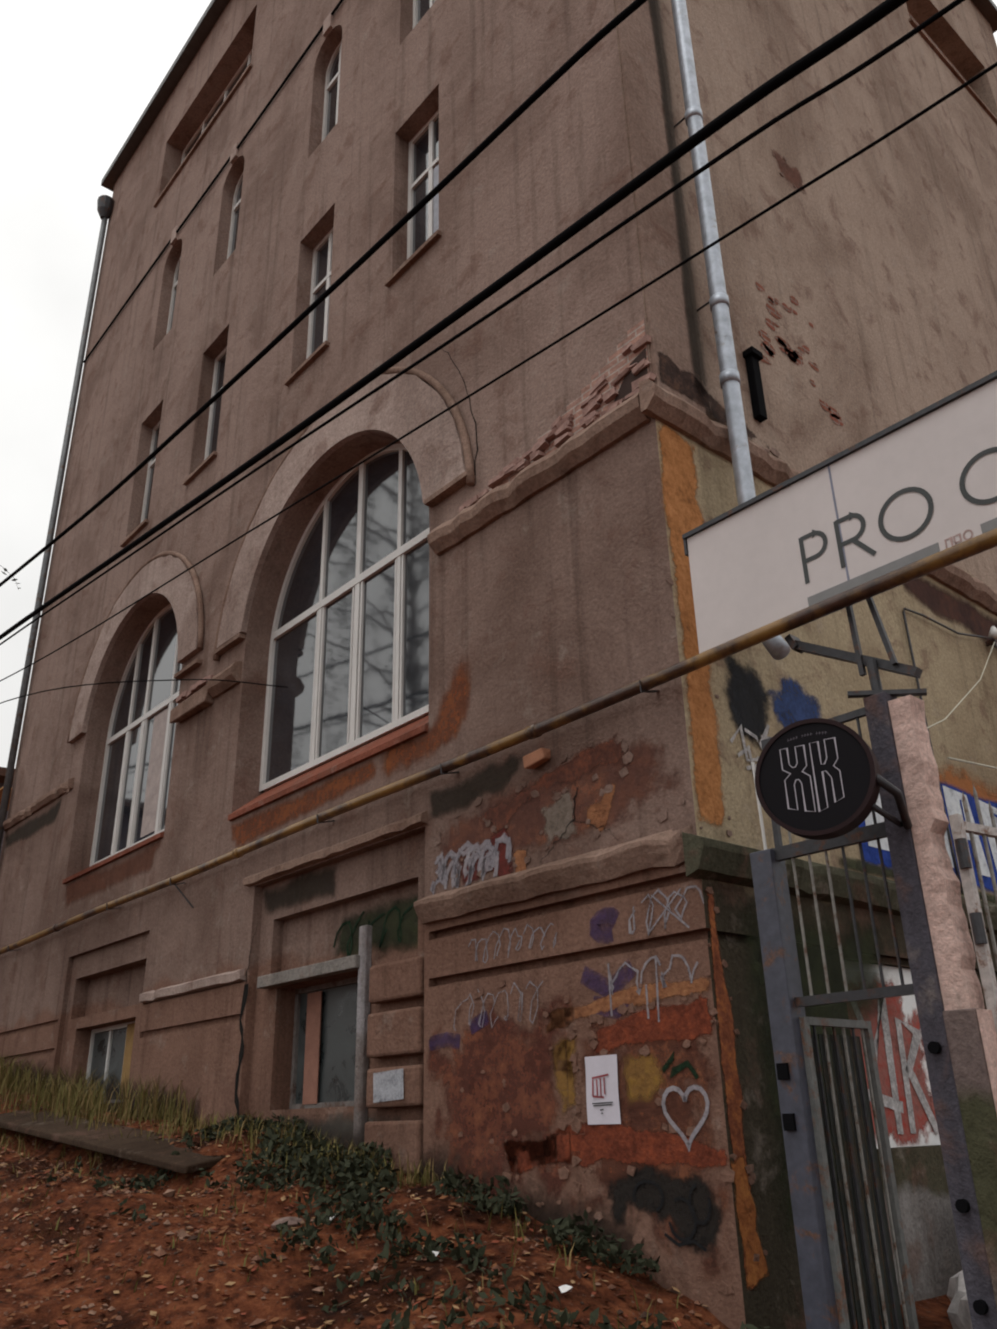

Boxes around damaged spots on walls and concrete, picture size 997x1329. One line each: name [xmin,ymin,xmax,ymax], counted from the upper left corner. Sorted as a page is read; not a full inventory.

peeling [489,319,727,491]
peeling [746,425,780,458]
flaking render [756,282,843,426]
flaking render [655,424,732,837]
flaking render [430,734,676,884]
damp [409,1153,722,1266]